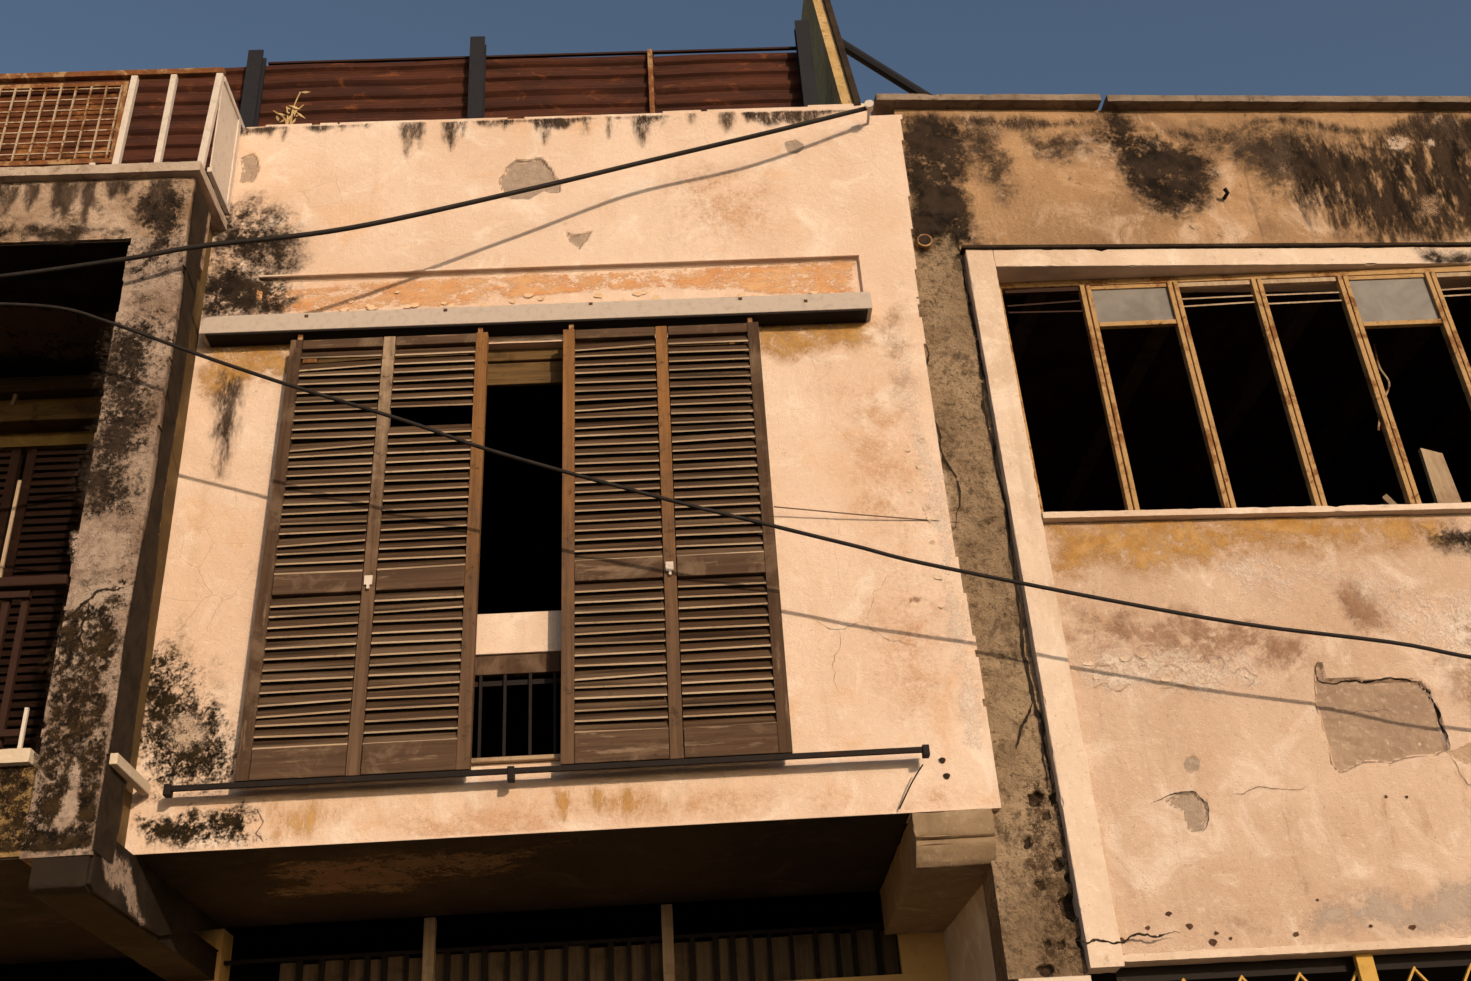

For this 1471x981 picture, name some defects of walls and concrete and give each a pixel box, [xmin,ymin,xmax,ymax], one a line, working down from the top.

leakage [443,122,465,148]
flaking render [498,159,561,200]
leakage [901,116,1012,254]
leakage [1028,111,1471,263]
crack [935,420,961,521]
leakage [0,179,301,864]
crack [960,257,1054,791]
leakage [1429,530,1471,552]
flaking render [1155,791,1209,832]
flaking render [1184,756,1200,773]
flaking render [1314,662,1471,773]
crack [1074,931,1180,945]